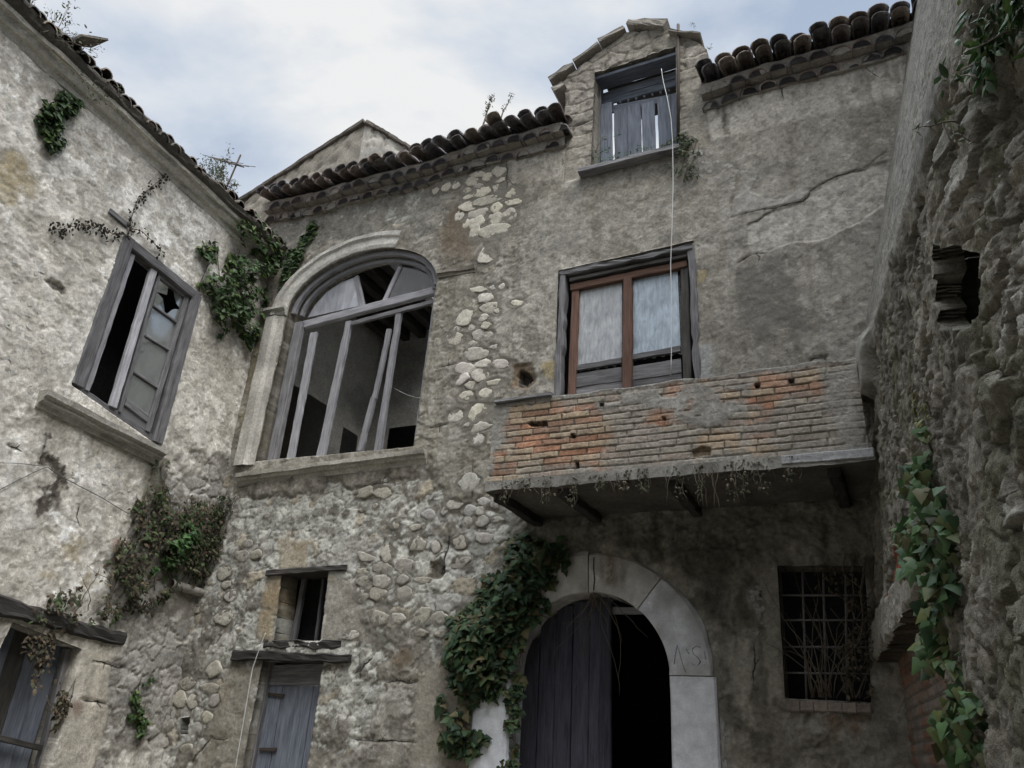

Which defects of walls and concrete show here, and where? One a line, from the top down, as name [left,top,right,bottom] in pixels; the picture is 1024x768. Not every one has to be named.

spalling [430,163,525,267]
crack [735,161,874,224]
spalling [442,279,535,447]
spalling [203,538,263,626]
spalling [353,472,507,639]